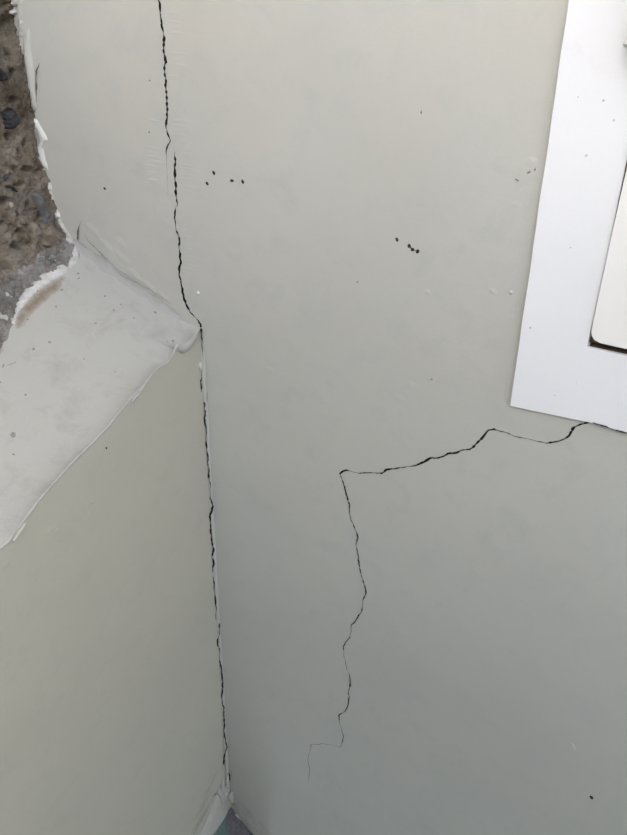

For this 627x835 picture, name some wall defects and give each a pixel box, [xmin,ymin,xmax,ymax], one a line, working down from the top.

spalling [0,0,79,346]
crack [157,0,230,780]
crack [308,421,627,782]